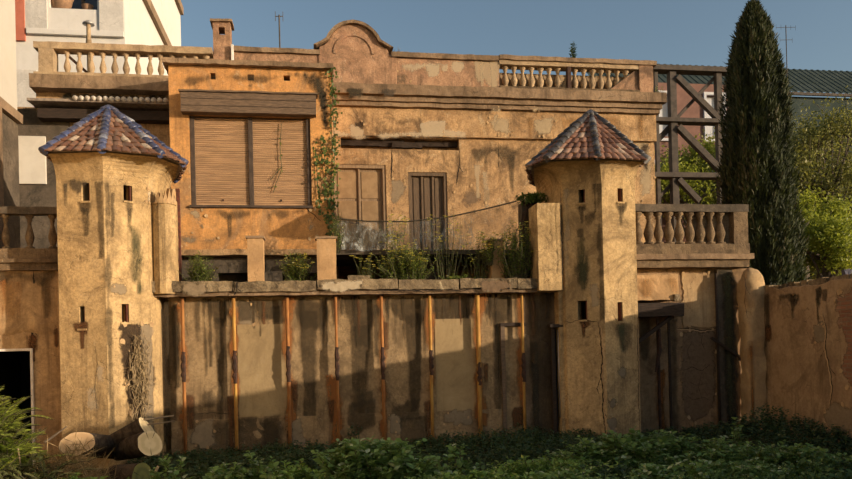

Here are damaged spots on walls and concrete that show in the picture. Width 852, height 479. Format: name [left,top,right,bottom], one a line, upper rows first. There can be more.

water stain [304,74,364,139]
water stain [380,121,465,138]
water stain [127,204,141,291]
water stain [566,183,605,318]
water stain [196,299,285,453]
water stain [296,298,329,416]
corrosion [326,375,344,447]
water stain [341,295,474,445]
crack [566,316,607,434]
water stain [816,286,827,323]
spalling [823,402,852,434]
flaking render [833,287,852,390]